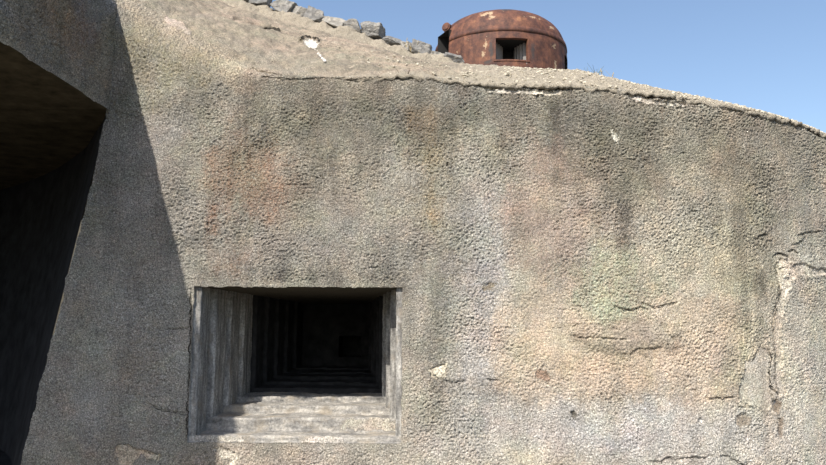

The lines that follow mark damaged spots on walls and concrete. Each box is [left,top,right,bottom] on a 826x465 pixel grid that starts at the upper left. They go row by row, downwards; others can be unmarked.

spalling [303,39,326,61]
crack [774,231,820,319]
flaking render [772,256,826,437]
spalling [114,441,162,465]
crack [653,455,750,465]